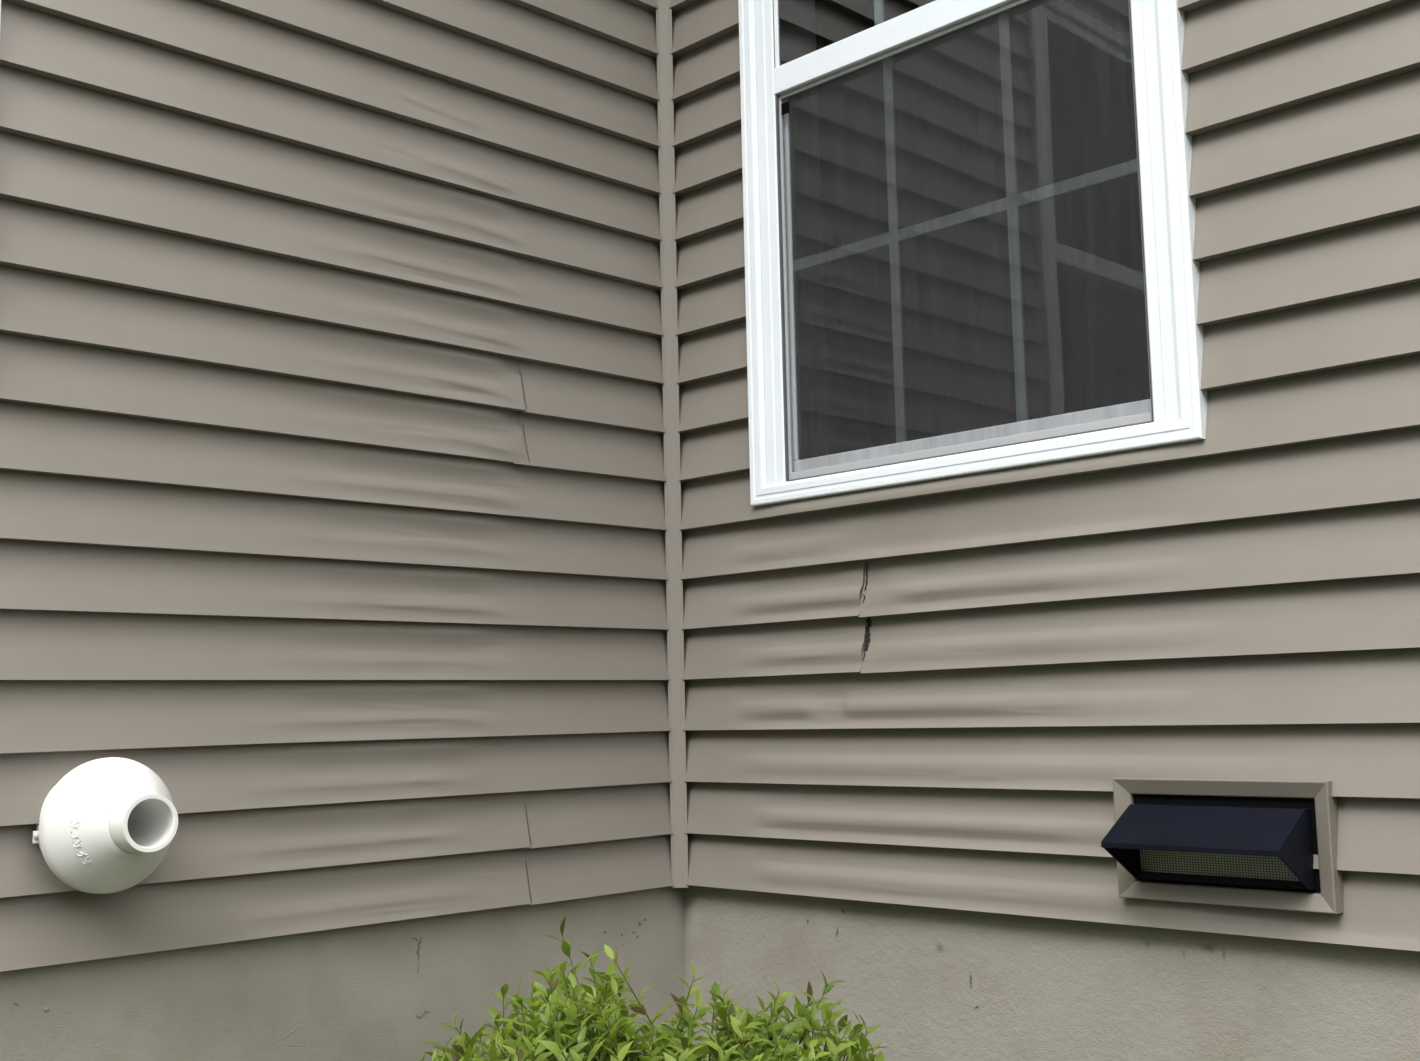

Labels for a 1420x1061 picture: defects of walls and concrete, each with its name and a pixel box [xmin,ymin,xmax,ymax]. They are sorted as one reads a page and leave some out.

crack [862,563,872,660]